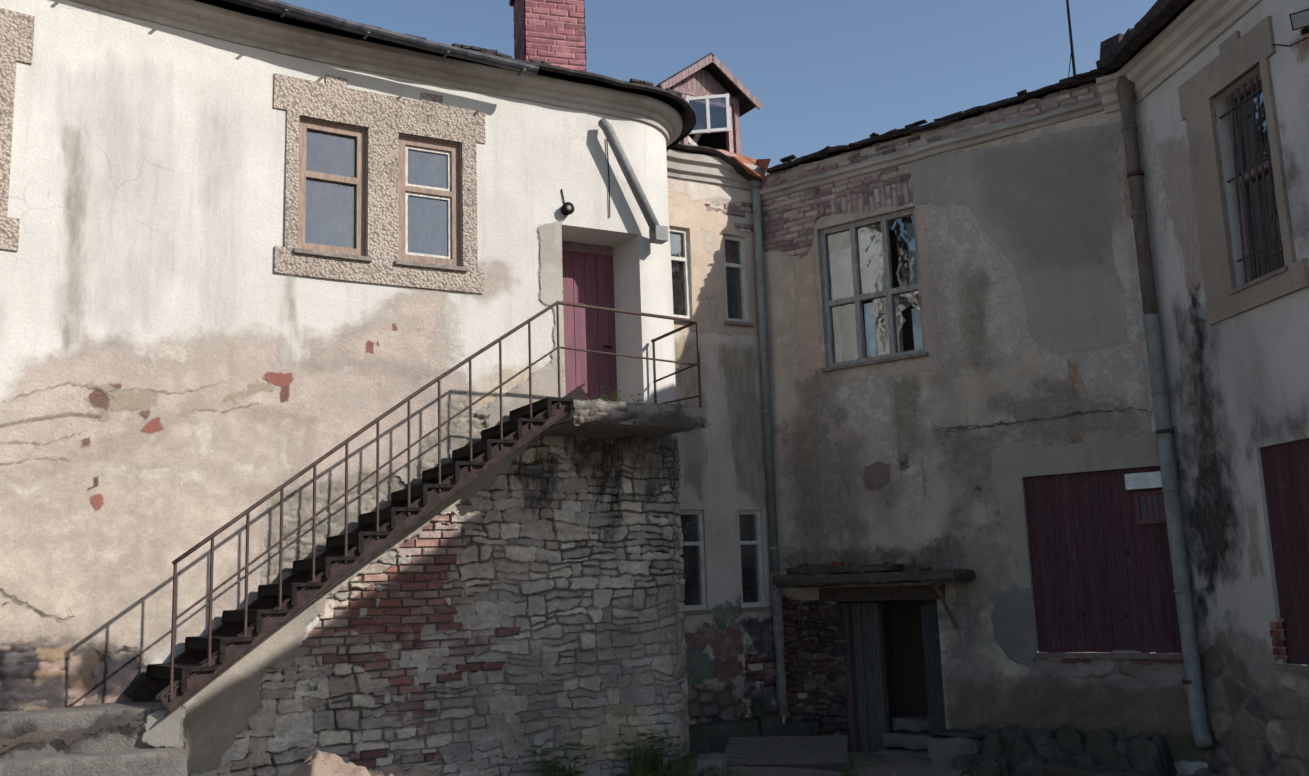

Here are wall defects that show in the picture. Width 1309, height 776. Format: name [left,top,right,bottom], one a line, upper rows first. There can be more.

spalling [668,167,913,336]
peeling [0,220,639,713]
leakage [507,341,706,541]
peeling [805,354,943,386]
spalling [863,455,909,505]
crack [895,389,1148,504]
leakage [1173,285,1277,704]
crack [0,588,75,620]
spalling [183,435,545,776]
flaking render [684,595,850,752]
flaking render [1269,618,1289,663]